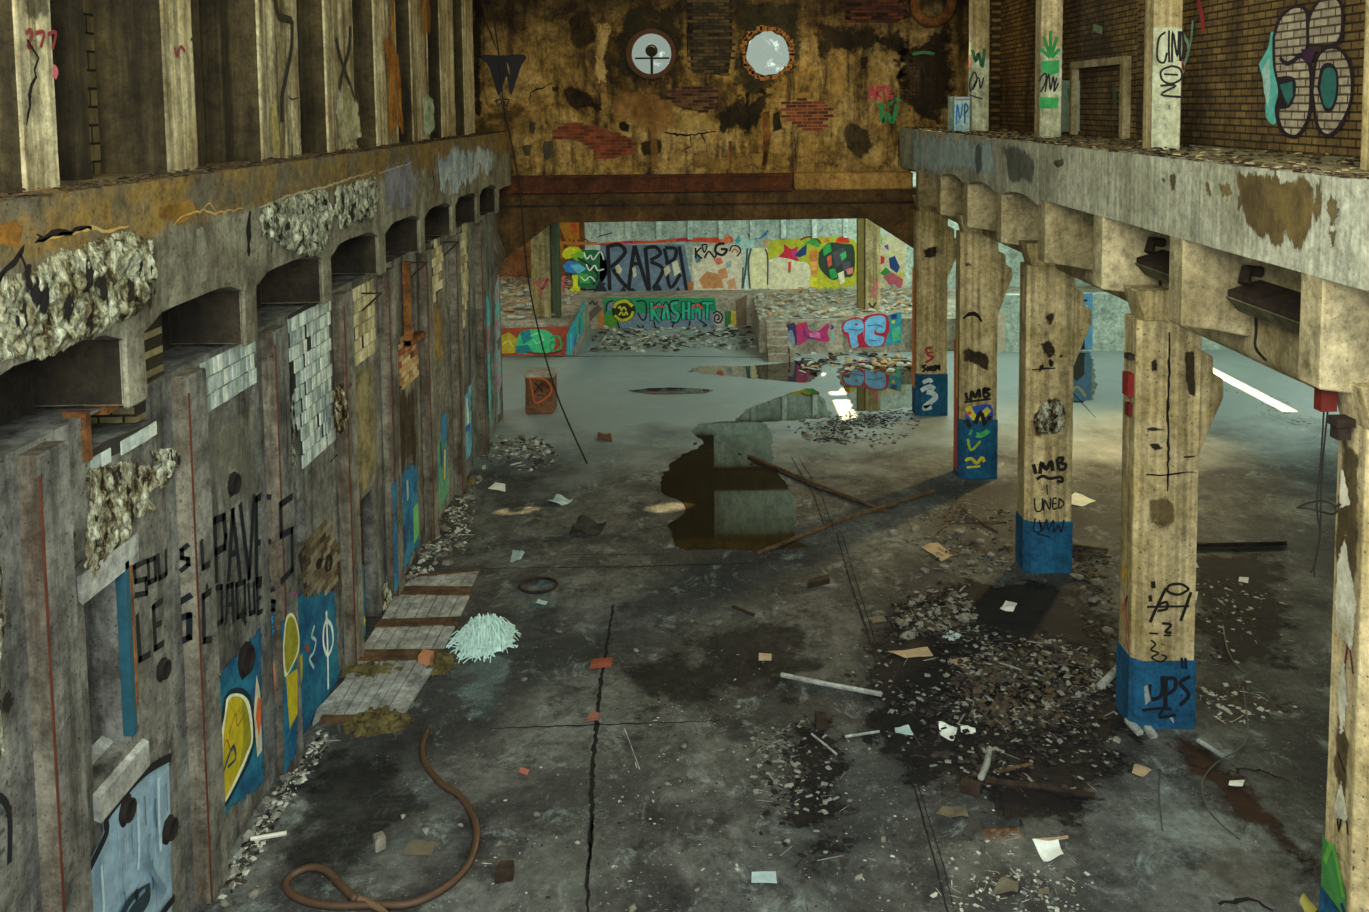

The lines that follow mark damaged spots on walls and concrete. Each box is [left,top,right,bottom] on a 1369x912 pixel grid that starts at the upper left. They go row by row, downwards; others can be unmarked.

flaking render [666,0,735,131]
flaking render [552,122,637,159]
flaking render [781,98,833,131]
spalling [260,176,379,257]
peeling [1326,199,1339,246]
spalling [0,230,158,365]
spalling [1034,398,1065,434]
spalling [72,421,180,578]
crack [532,554,752,568]
spalling [0,566,14,763]
crack [490,604,720,912]